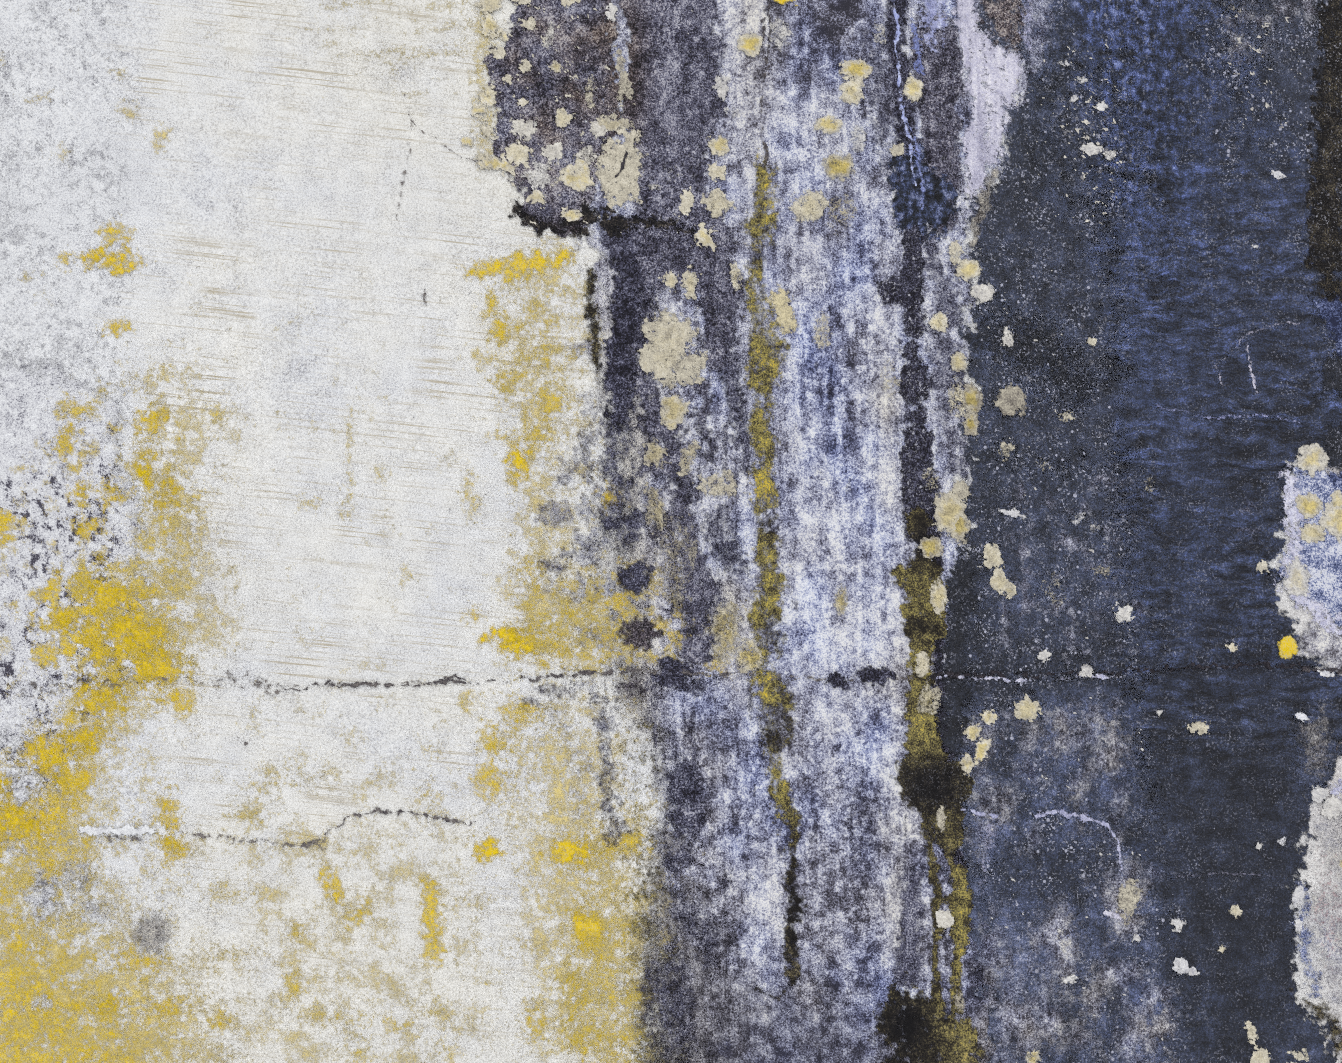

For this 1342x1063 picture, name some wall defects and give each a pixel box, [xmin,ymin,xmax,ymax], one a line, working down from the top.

water stain [456,0,1342,1063]
crack [1,660,1342,699]
crack [179,807,476,850]